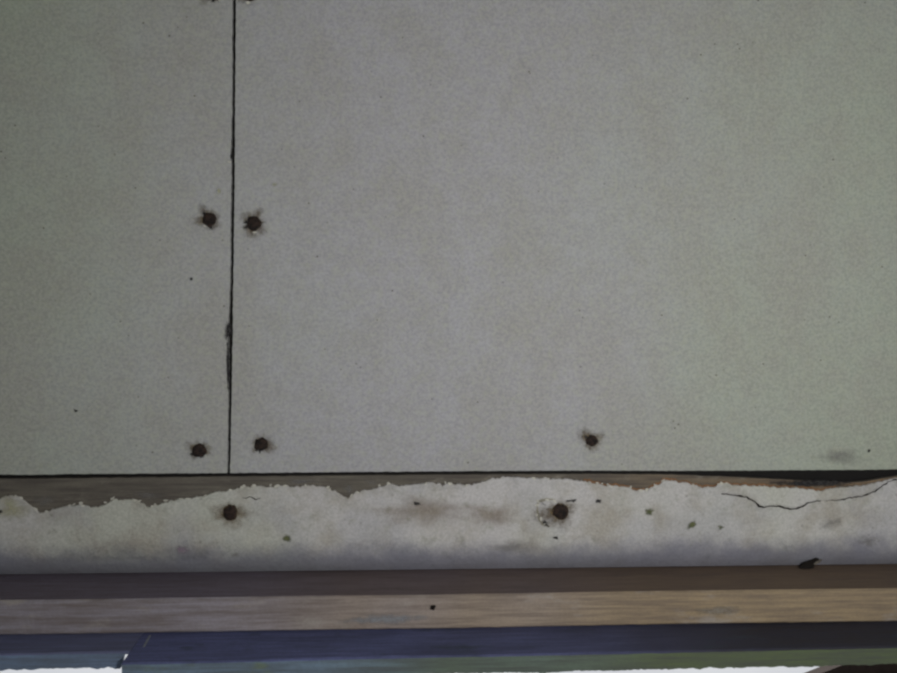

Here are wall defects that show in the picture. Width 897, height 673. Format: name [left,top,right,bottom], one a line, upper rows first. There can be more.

peeling [0,474,897,513]
crack [722,479,897,510]